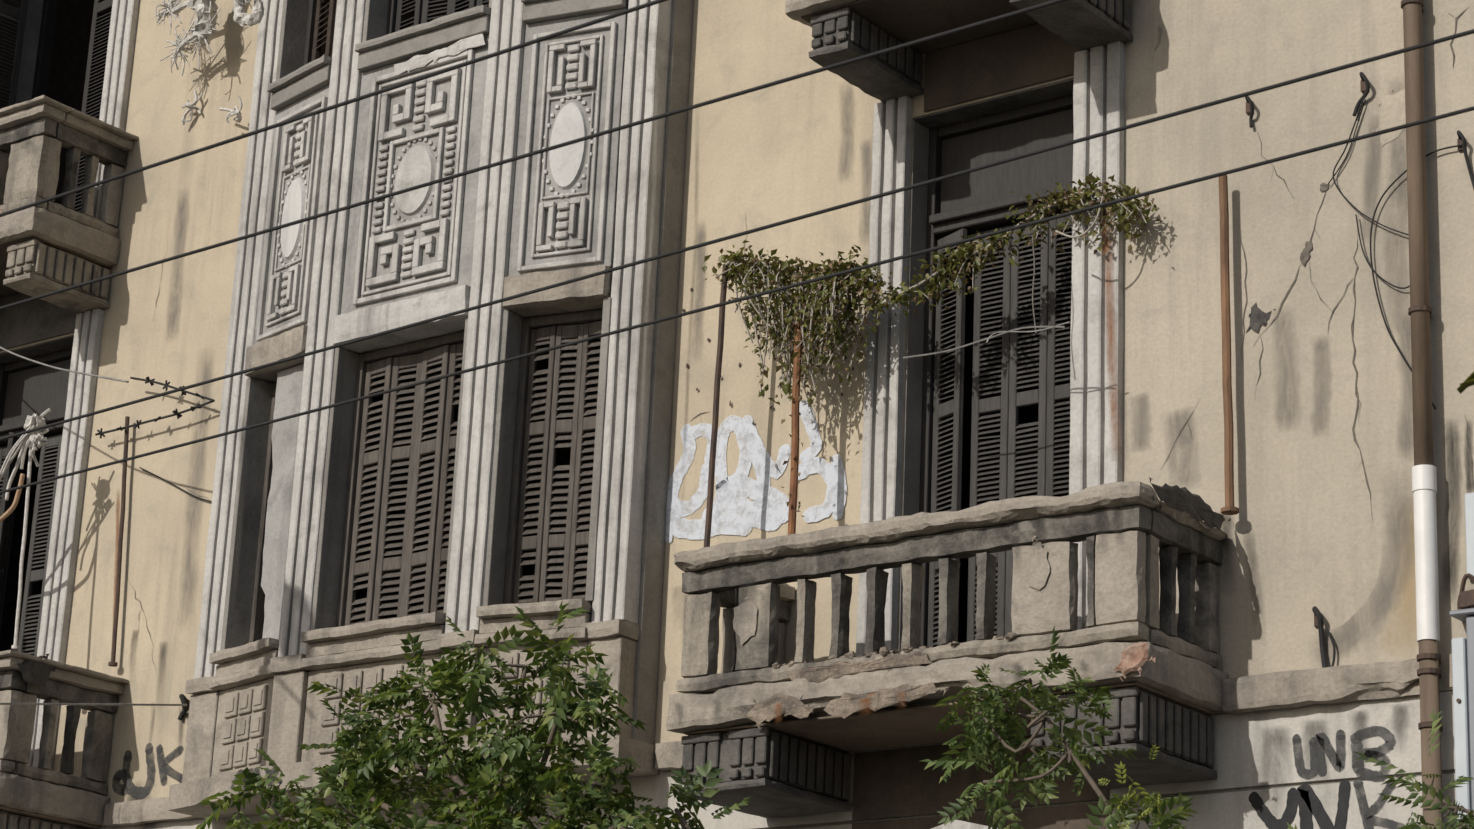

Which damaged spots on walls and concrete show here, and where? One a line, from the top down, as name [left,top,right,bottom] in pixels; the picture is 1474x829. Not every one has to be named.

crack [1237,132,1373,521]
spalling [745,651,949,728]
spalling [1114,642,1156,681]